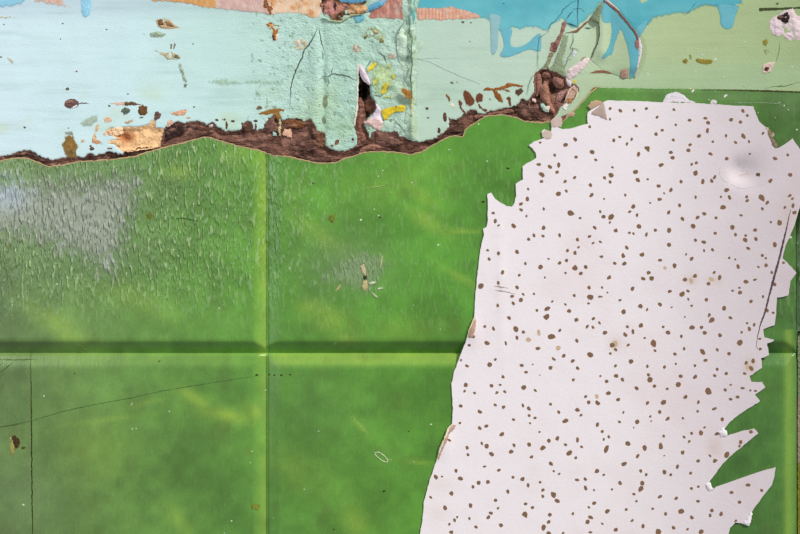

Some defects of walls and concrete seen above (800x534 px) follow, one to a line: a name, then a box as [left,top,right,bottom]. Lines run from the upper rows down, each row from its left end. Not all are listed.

spalling [769,3,800,41]
spalling [0,0,642,166]
crack [290,27,386,99]